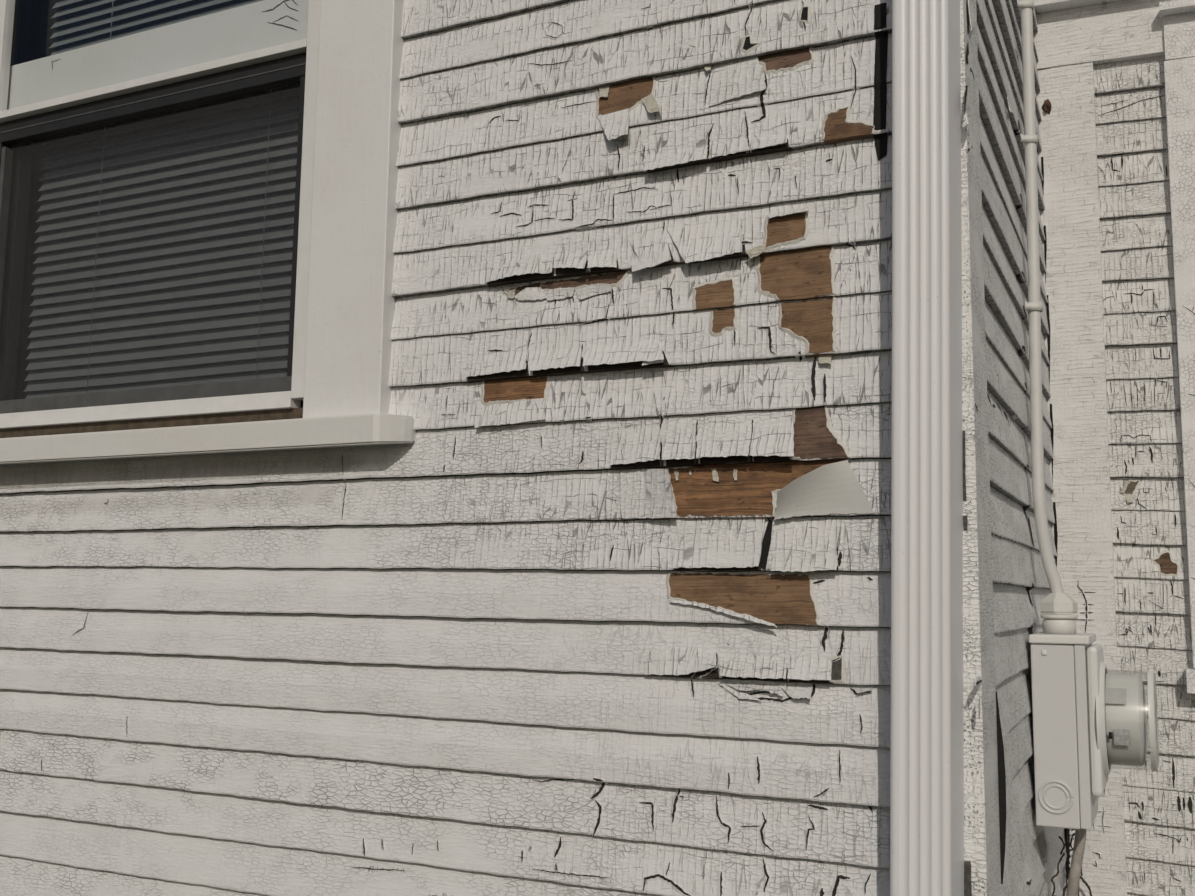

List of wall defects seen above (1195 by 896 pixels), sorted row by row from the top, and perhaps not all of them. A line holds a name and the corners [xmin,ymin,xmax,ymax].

peeling [594,77,662,141]
peeling [703,34,815,106]
crack [490,144,681,236]
peeling [486,205,838,364]
peeling [466,339,673,428]
crack [732,325,829,402]
peeling [609,406,874,628]
peeling [644,647,872,701]
crack [689,625,847,705]
crack [532,777,608,836]
crack [639,756,773,896]
crack [1092,758,1194,883]